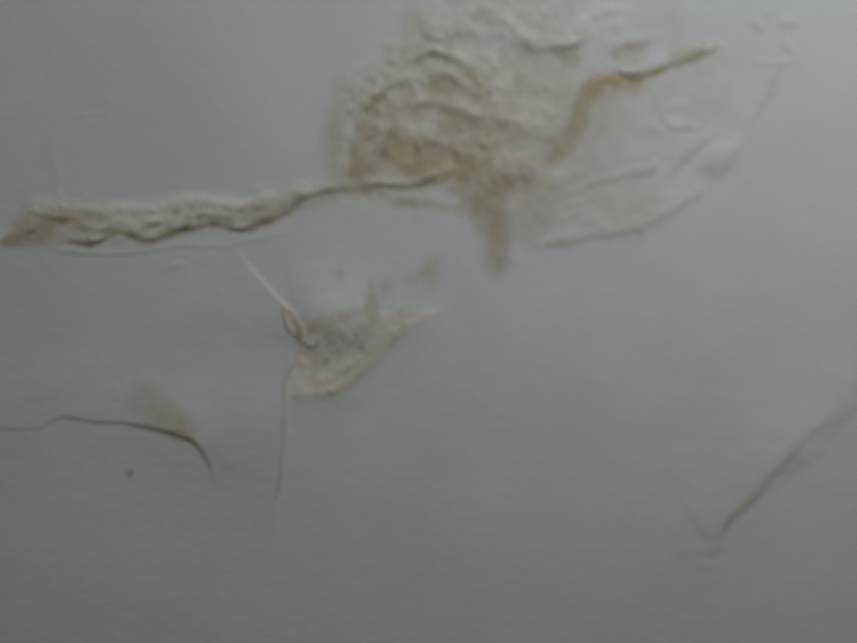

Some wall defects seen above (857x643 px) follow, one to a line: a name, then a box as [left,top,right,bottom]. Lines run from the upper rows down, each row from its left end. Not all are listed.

spalling [0,166,457,433]
leakage [240,212,277,231]